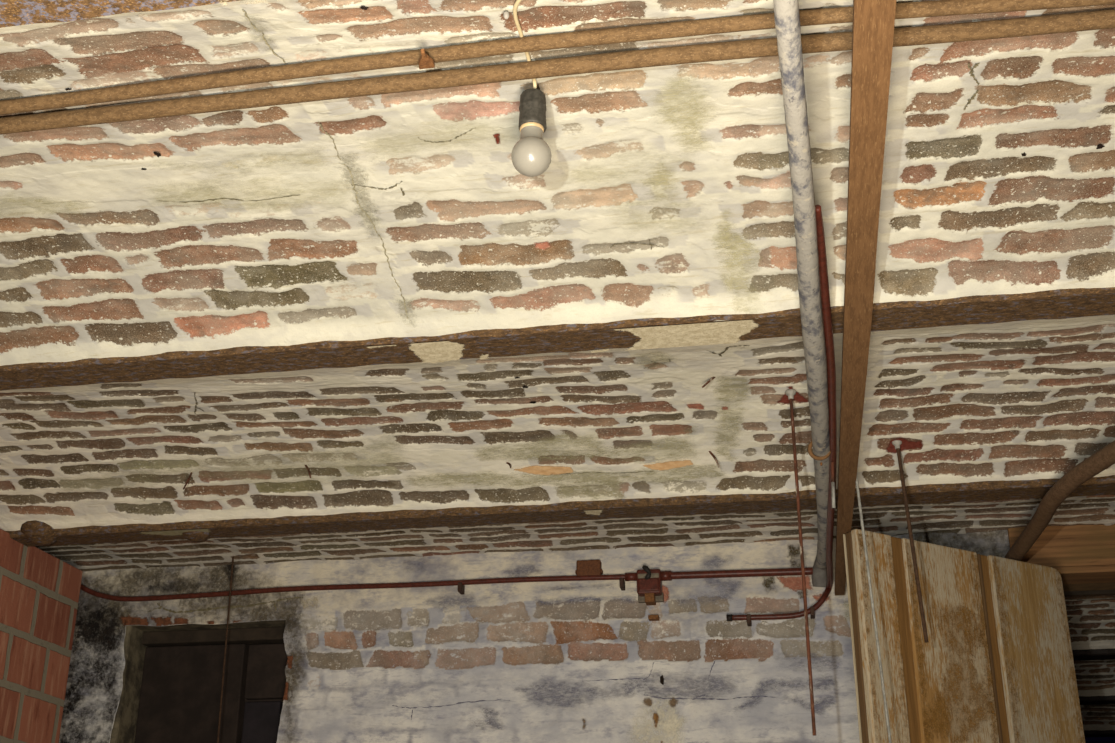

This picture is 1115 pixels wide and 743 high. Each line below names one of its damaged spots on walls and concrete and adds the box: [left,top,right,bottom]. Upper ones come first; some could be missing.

crack [243,9,285,63]
crack [318,122,408,319]
damp [60,649,76,743]
damp [105,610,123,722]
damp [285,625,305,740]